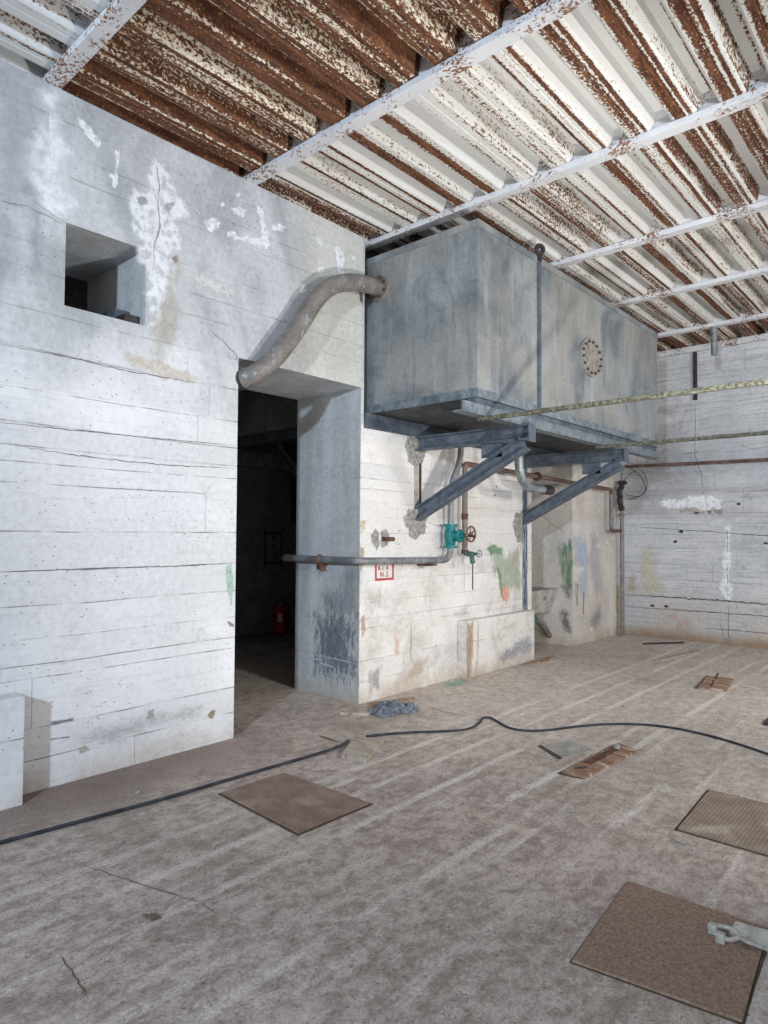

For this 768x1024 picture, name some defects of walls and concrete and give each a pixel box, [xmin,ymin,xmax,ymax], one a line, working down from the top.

leakage [128,157,191,327]
crack [83,865,213,912]
crack [61,955,88,997]